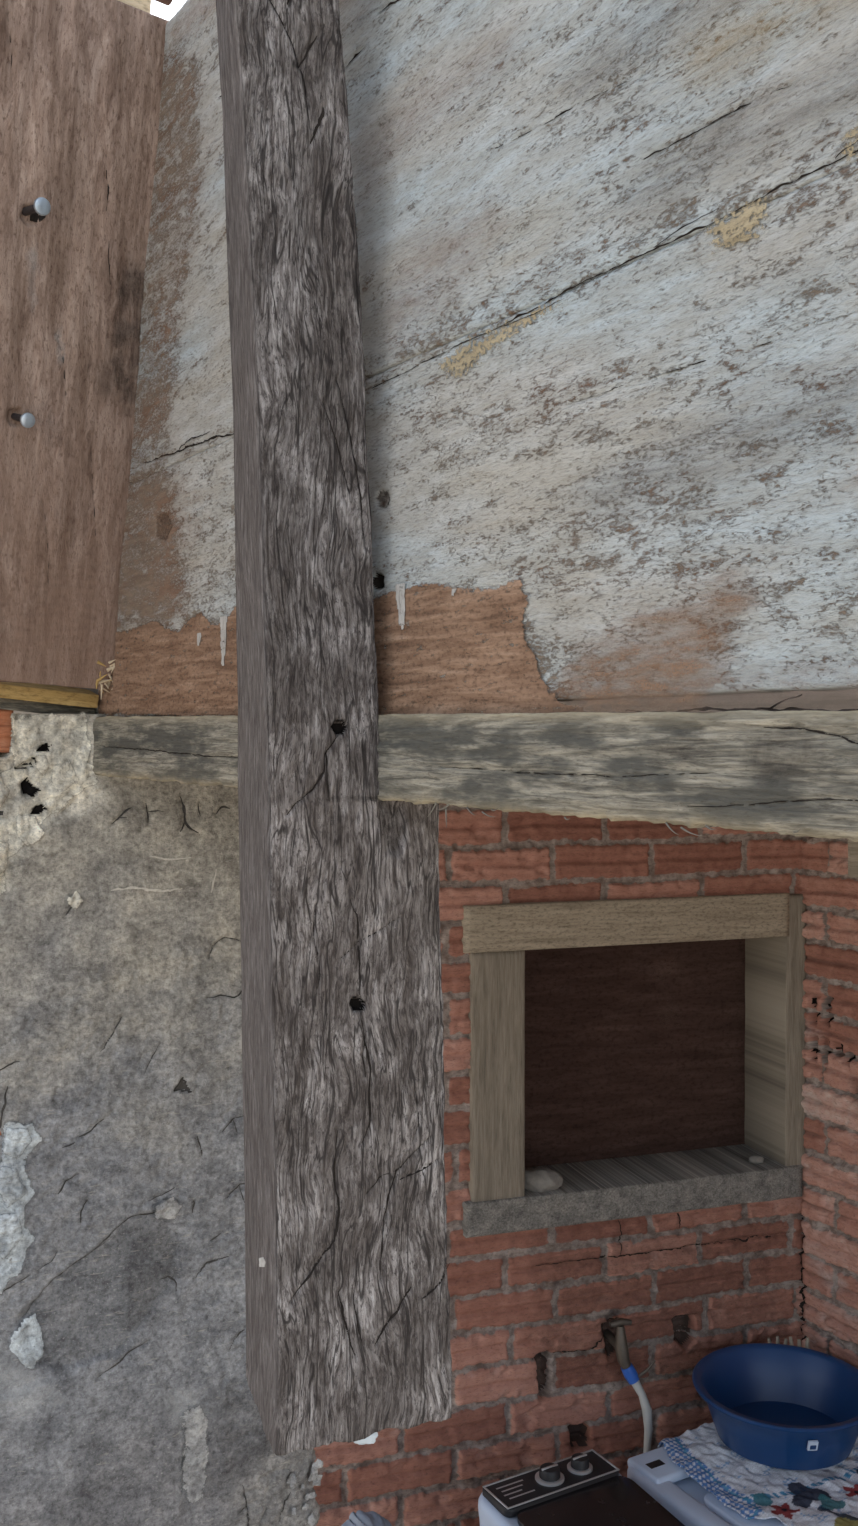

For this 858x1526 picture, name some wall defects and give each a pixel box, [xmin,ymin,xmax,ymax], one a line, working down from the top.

crack [324,140,858,545]
peeling [374,580,585,715]
peeling [0,606,238,895]
spalling [67,891,83,909]
crack [0,1061,20,1128]
peeling [3,1127,32,1159]
peeling [0,1213,23,1260]
crack [4,1116,245,1313]
crack [100,1342,145,1376]